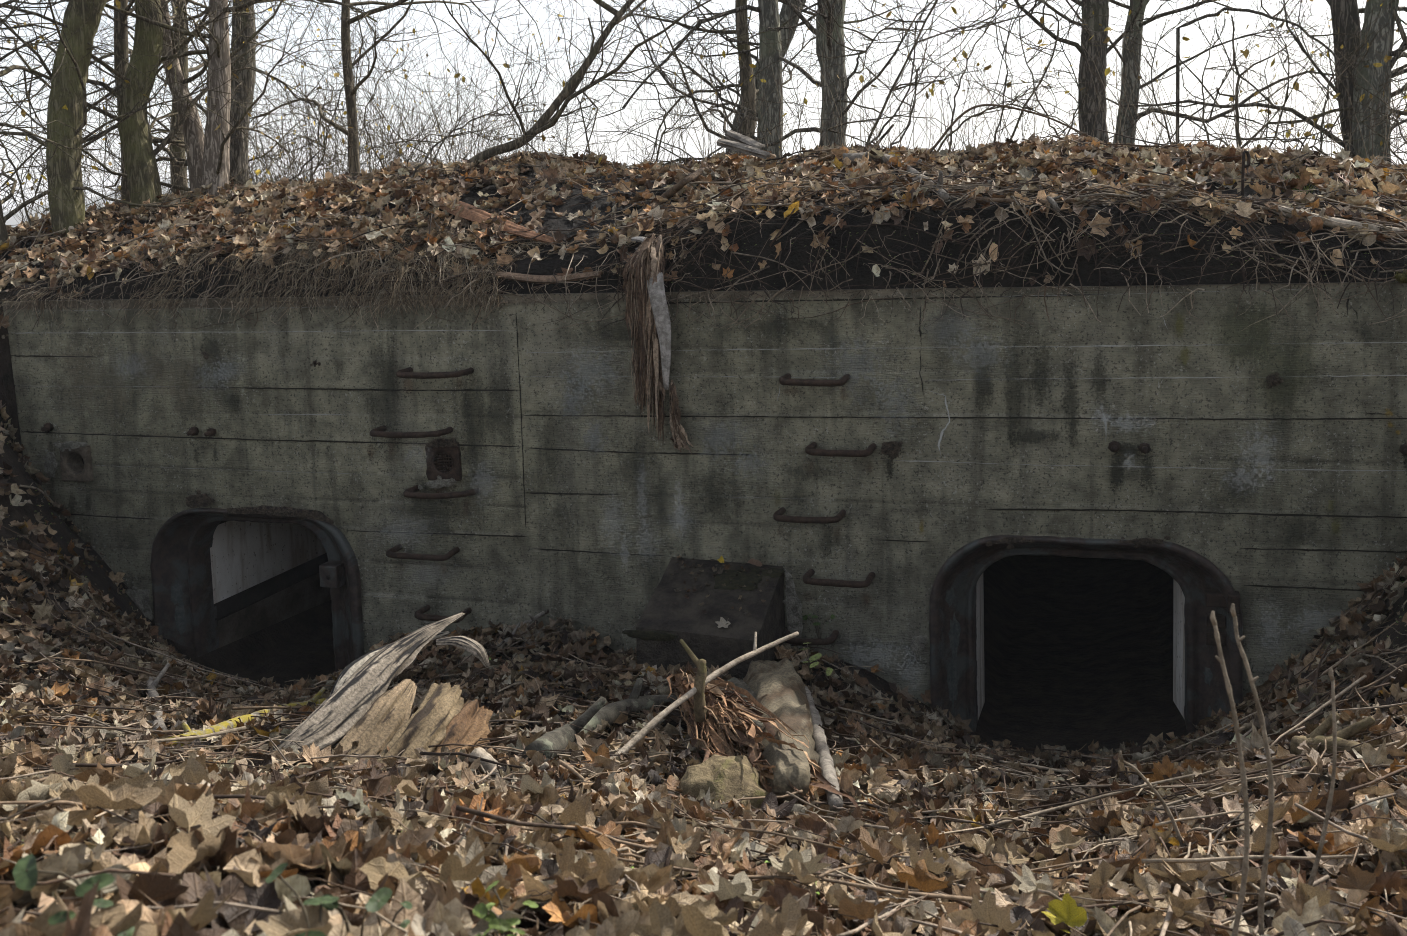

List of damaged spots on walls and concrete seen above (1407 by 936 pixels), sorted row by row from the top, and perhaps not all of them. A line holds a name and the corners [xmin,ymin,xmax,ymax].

damp [884,391,995,479]
damp [938,342,1228,494]